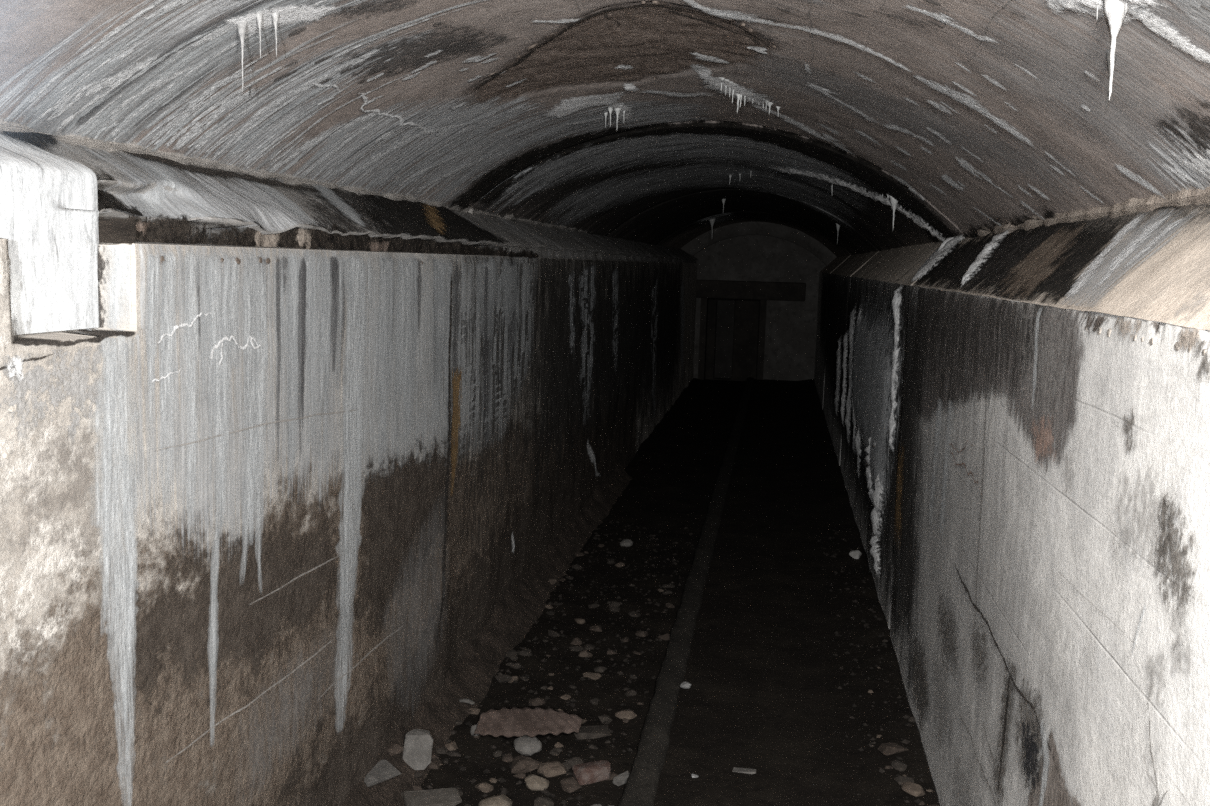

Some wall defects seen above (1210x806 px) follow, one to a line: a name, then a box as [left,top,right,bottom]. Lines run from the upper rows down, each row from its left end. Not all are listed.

leakage [1137,0,1210,33]
leakage [941,62,1018,113]
leakage [817,123,880,155]
leakage [890,136,1050,220]
crack [0,312,263,381]
leakage [0,0,869,806]
crack [949,376,1060,806]
leakage [912,637,930,730]
leakage [937,595,988,684]
leakage [994,661,1081,806]